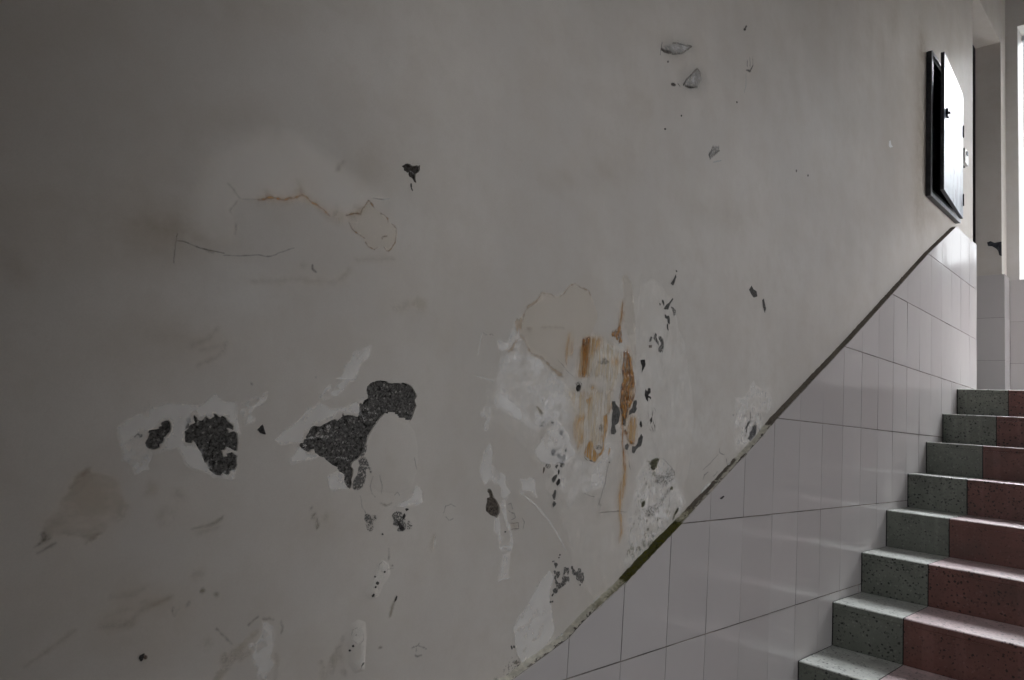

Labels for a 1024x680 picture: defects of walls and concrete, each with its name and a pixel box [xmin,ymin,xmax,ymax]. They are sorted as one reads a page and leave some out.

spalling [402,164,419,191]
peeling [640,298,676,371]
spalling [134,420,171,449]
spalling [184,414,237,475]
spalling [299,380,415,489]
corrosion [578,303,636,487]
spalling [599,388,651,434]
spalling [486,489,498,517]
peeling [543,448,567,507]
peeling [549,554,584,603]